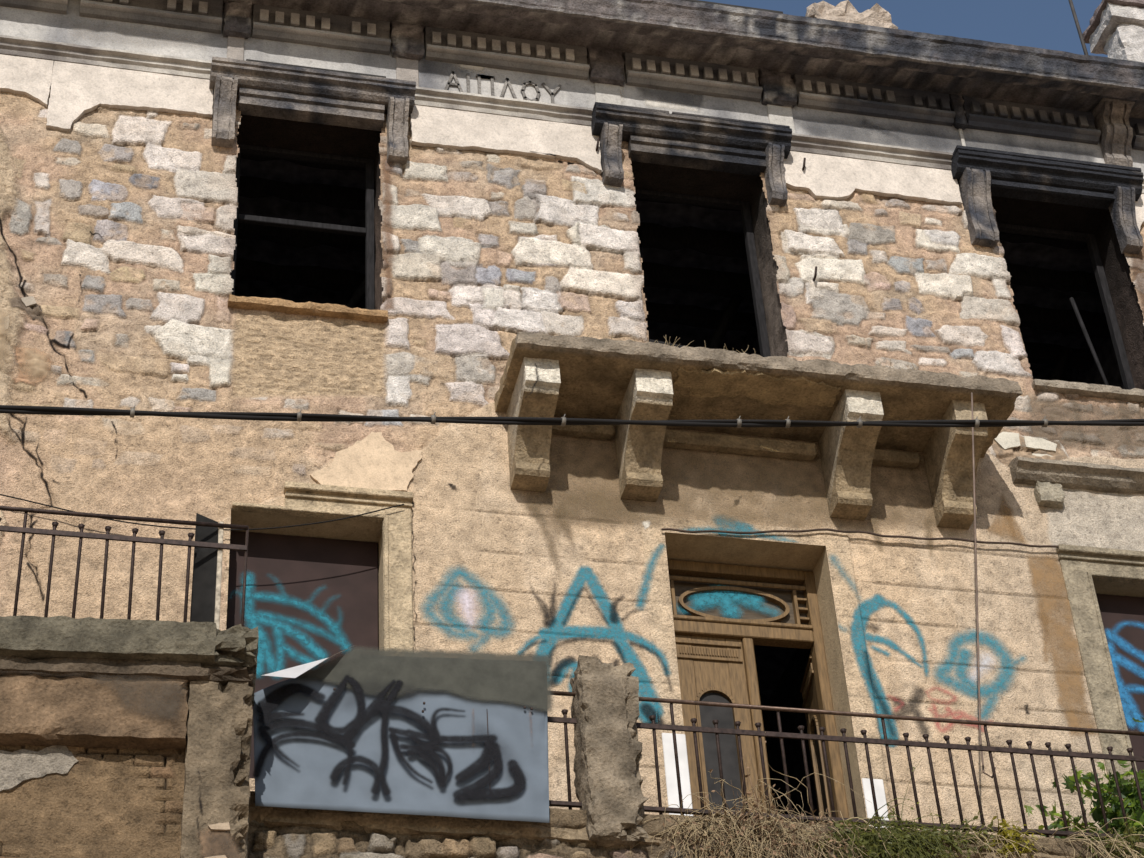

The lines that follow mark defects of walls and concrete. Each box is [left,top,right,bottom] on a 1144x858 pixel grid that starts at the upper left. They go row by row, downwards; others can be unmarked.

flaking render [1135,194,1144,231]
spalling [10,296,43,321]
crack [0,219,87,398]
flaking render [310,432,422,492]
crack [9,414,58,600]
flaking render [0,745,79,792]